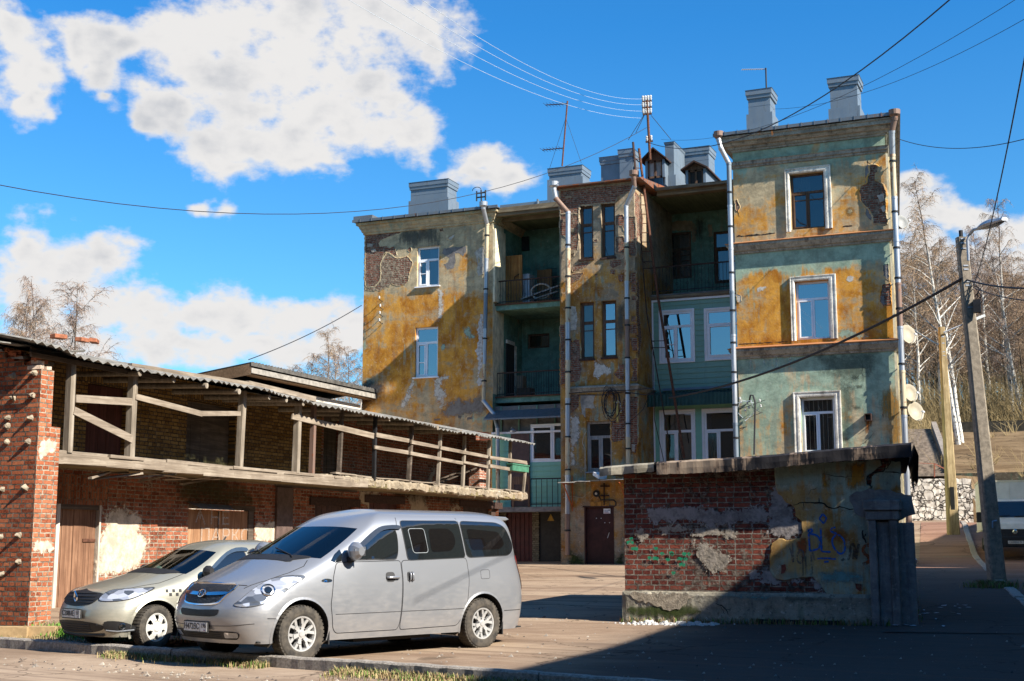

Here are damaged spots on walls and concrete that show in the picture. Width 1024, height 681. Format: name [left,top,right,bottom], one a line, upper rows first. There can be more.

spalling [858,163,889,226]
spalling [363,232,413,291]
spalling [558,183,643,301]
spalling [559,305,596,418]
spalling [613,315,639,383]
peeling [645,486,801,540]
crack [795,459,899,543]